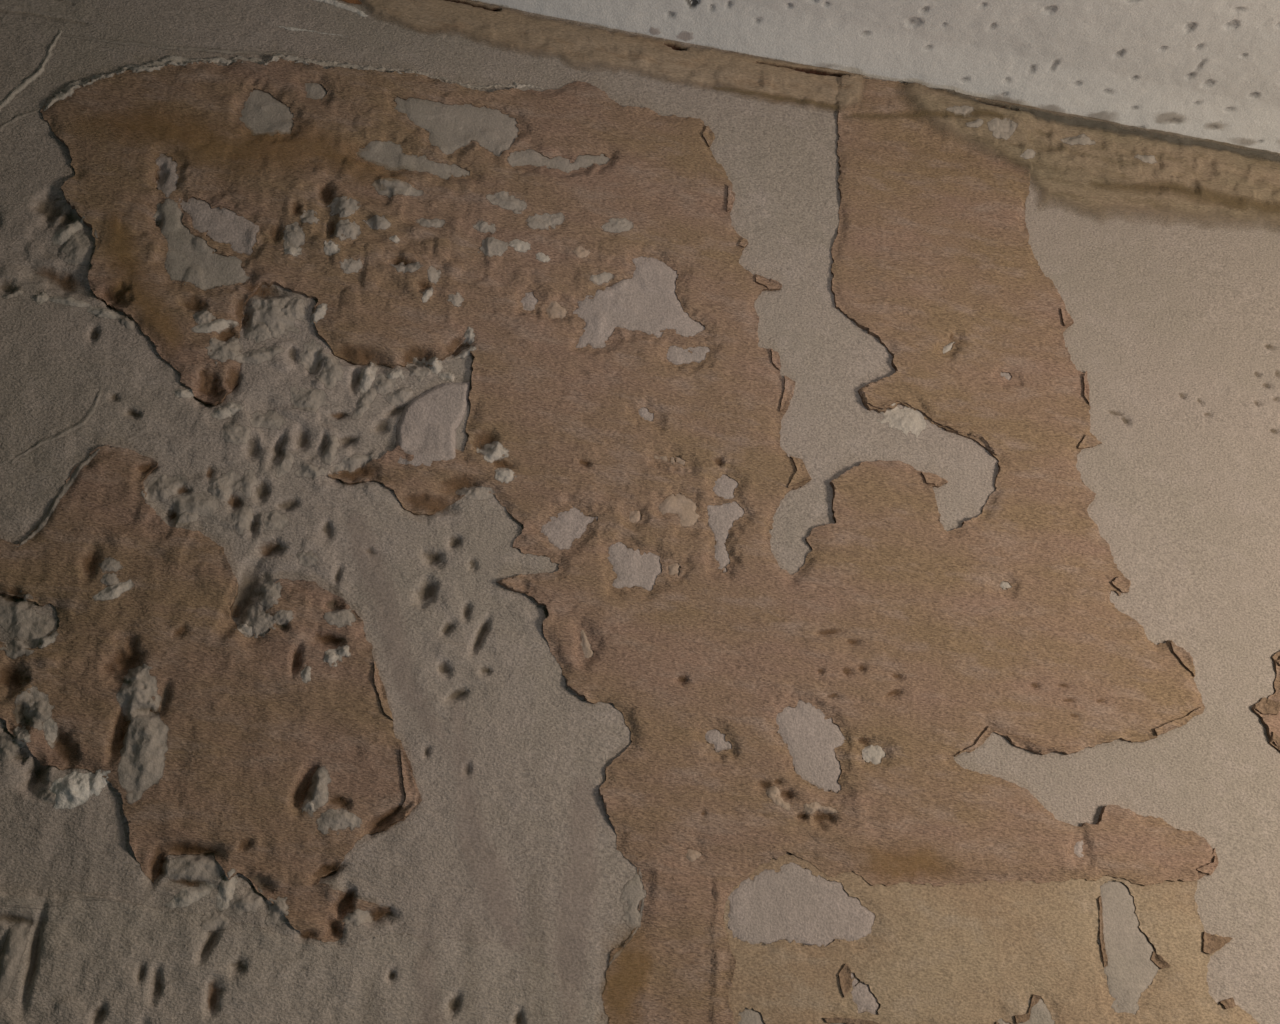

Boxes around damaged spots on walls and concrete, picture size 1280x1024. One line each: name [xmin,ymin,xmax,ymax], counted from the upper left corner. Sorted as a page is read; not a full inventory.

flaking render [239,90,294,136]
flaking render [987,117,1018,140]
flaking render [480,237,531,257]
flaking render [573,256,705,348]
flaking render [396,382,470,466]
flaking render [541,506,595,550]
flaking render [608,542,662,591]
flaking render [659,493,700,527]
flaking render [707,502,744,573]
peeling [0,444,422,942]
peeling [1251,651,1280,752]
flaking render [776,700,846,793]